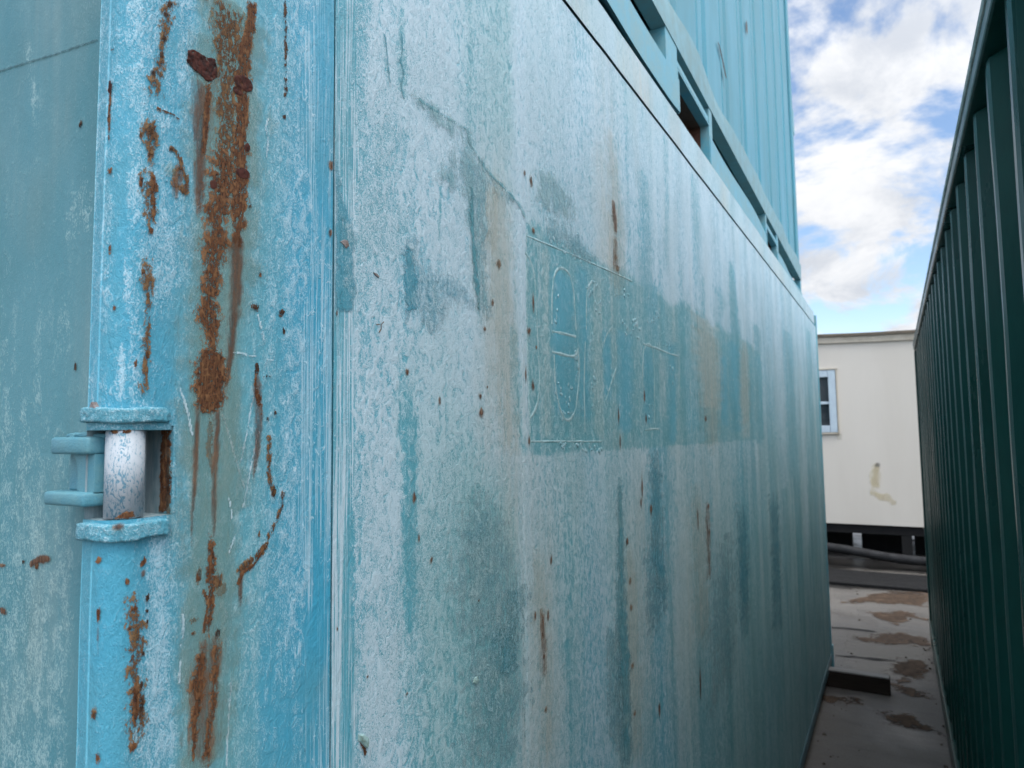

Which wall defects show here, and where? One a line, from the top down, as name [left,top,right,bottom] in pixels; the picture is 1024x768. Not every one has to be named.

rust [134,256,156,393]
rust [138,0,285,767]
rust [123,578,149,753]